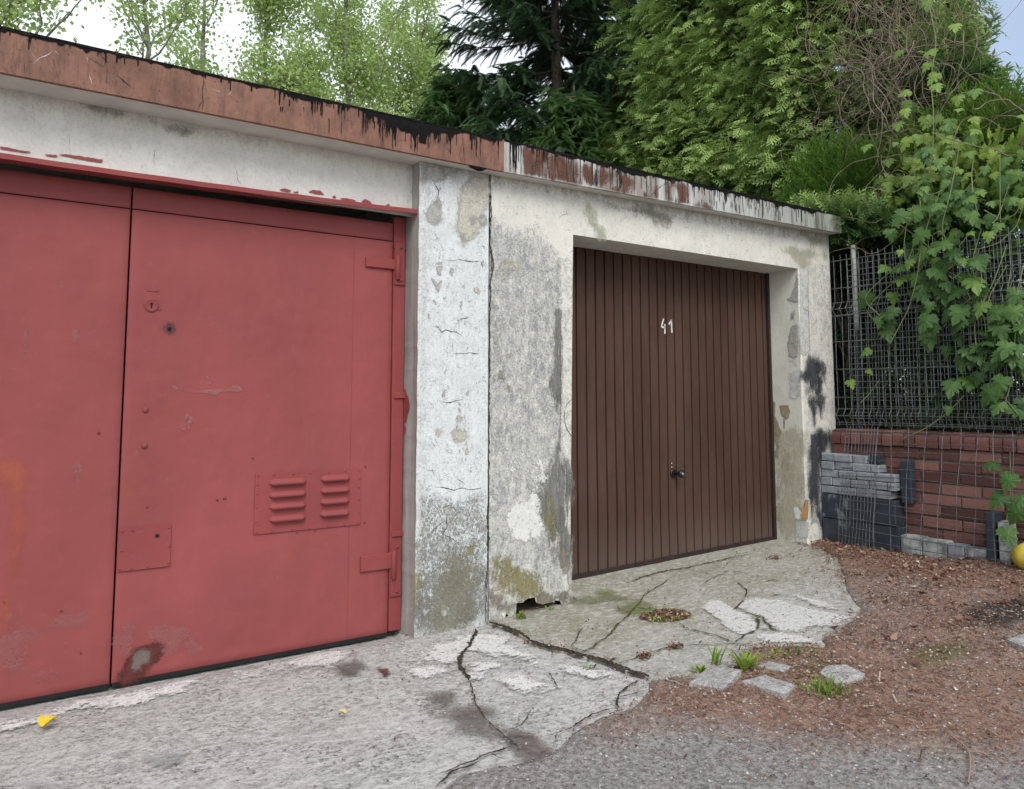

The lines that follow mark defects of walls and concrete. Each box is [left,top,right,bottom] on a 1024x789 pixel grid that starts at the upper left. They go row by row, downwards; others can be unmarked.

peeling [426,199,442,225]
flaking render [455,175,491,246]
rust [522,146,710,209]
damp [549,308,563,407]
flaking render [773,272,802,458]
crack [426,178,784,786]
damp [775,375,831,539]
damp [489,554,515,611]